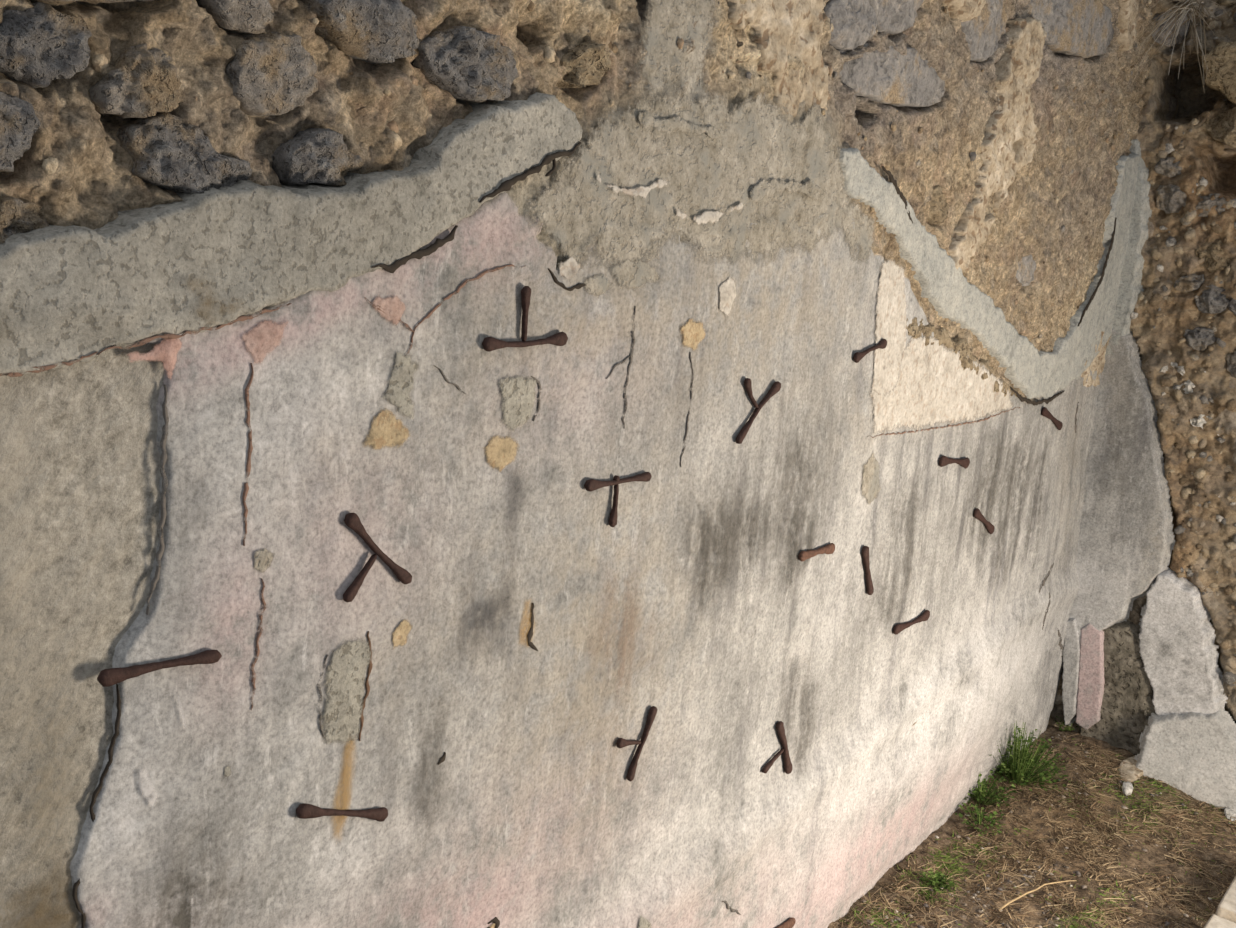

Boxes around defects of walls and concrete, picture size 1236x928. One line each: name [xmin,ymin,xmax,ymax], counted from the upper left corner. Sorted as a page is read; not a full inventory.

flaking render [528,0,875,315]
crack [72,852,86,928]
flaking render [0,343,165,928]
crack [89,684,121,822]
peeling [1062,329,1175,755]